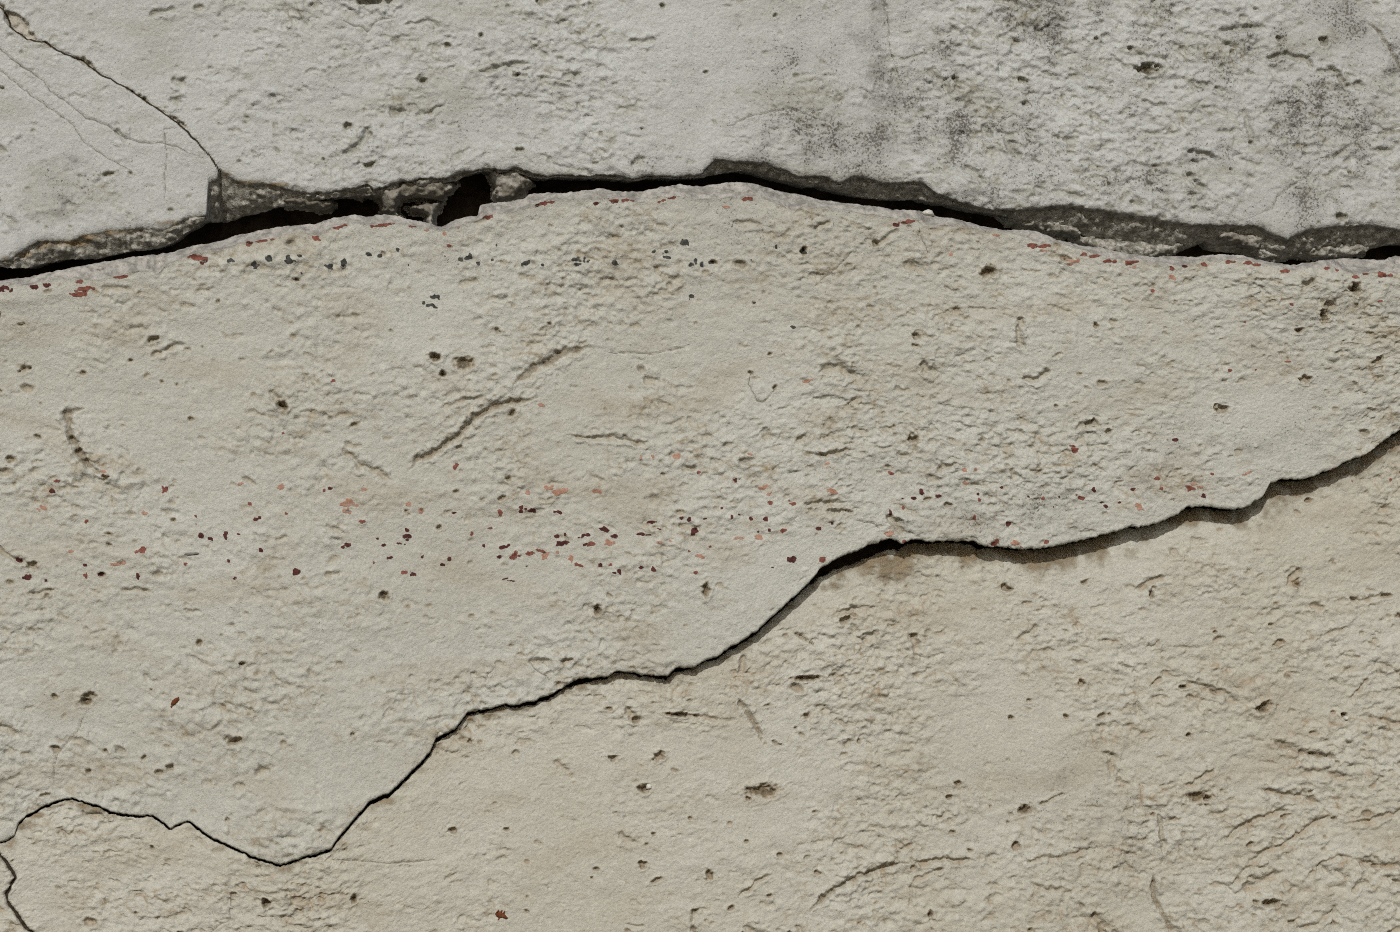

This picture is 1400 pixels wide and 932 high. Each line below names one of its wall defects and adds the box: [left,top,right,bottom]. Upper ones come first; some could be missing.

crack [0,3,220,172]
crack [0,170,1400,281]
crack [1186,504,1239,512]
crack [1278,461,1347,482]
crack [0,526,1145,932]